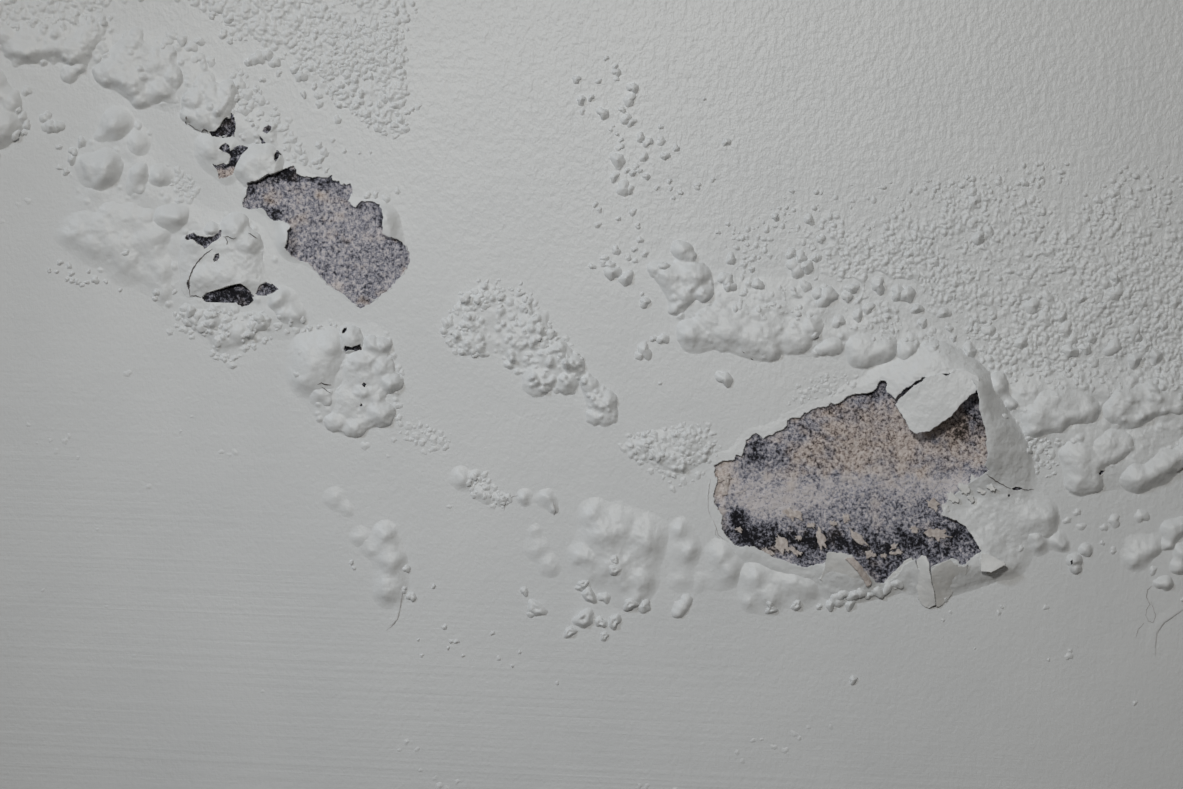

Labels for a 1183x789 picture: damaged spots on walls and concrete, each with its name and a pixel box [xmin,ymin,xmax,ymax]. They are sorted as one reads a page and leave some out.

peeling [241,161,410,308]
peeling [706,340,1060,609]